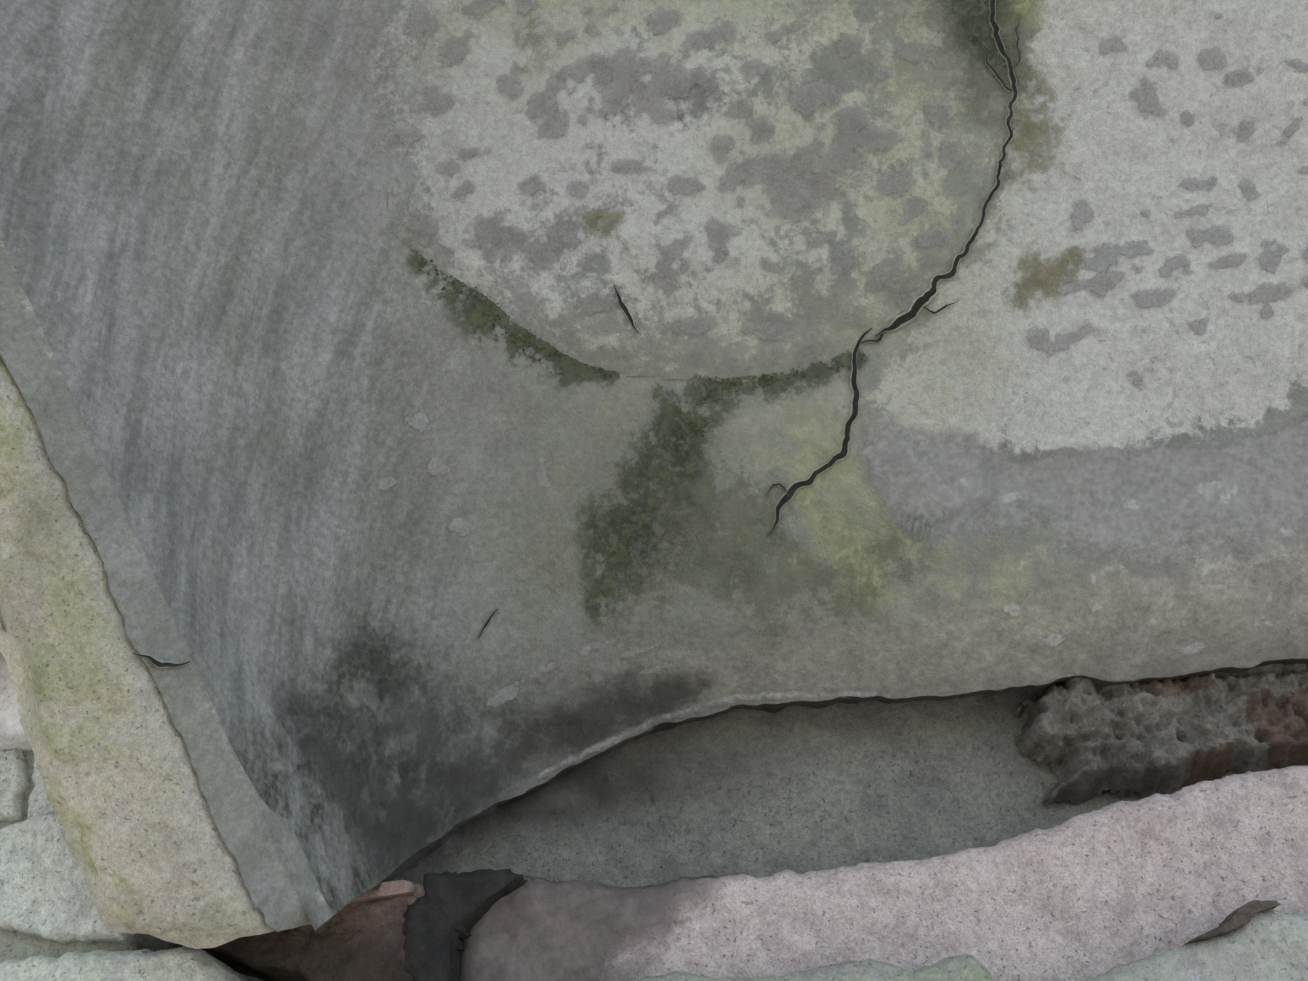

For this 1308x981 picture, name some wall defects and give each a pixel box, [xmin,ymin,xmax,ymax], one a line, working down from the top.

crack [764,0,1021,536]
flaking render [1013,658,1308,807]